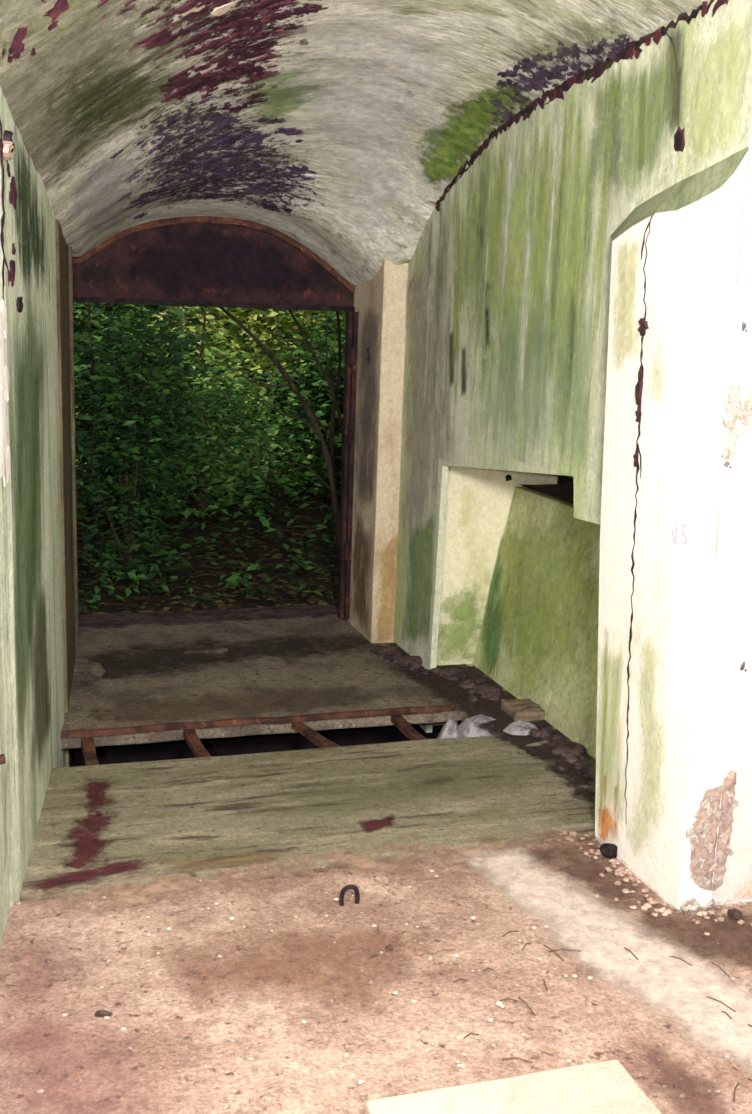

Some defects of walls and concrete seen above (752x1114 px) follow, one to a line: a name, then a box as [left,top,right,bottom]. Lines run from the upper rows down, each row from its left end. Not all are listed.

peeling [2,25,36,63]
peeling [41,0,69,31]
peeling [96,0,330,221]
peeling [480,28,632,123]
crack [435,0,729,212]
leakage [666,30,682,128]
leakage [519,120,565,394]
leakage [574,80,627,359]
leakage [404,154,513,522]
spalling [720,385,752,468]
leakage [389,643,596,802]
spalling [679,771,747,914]